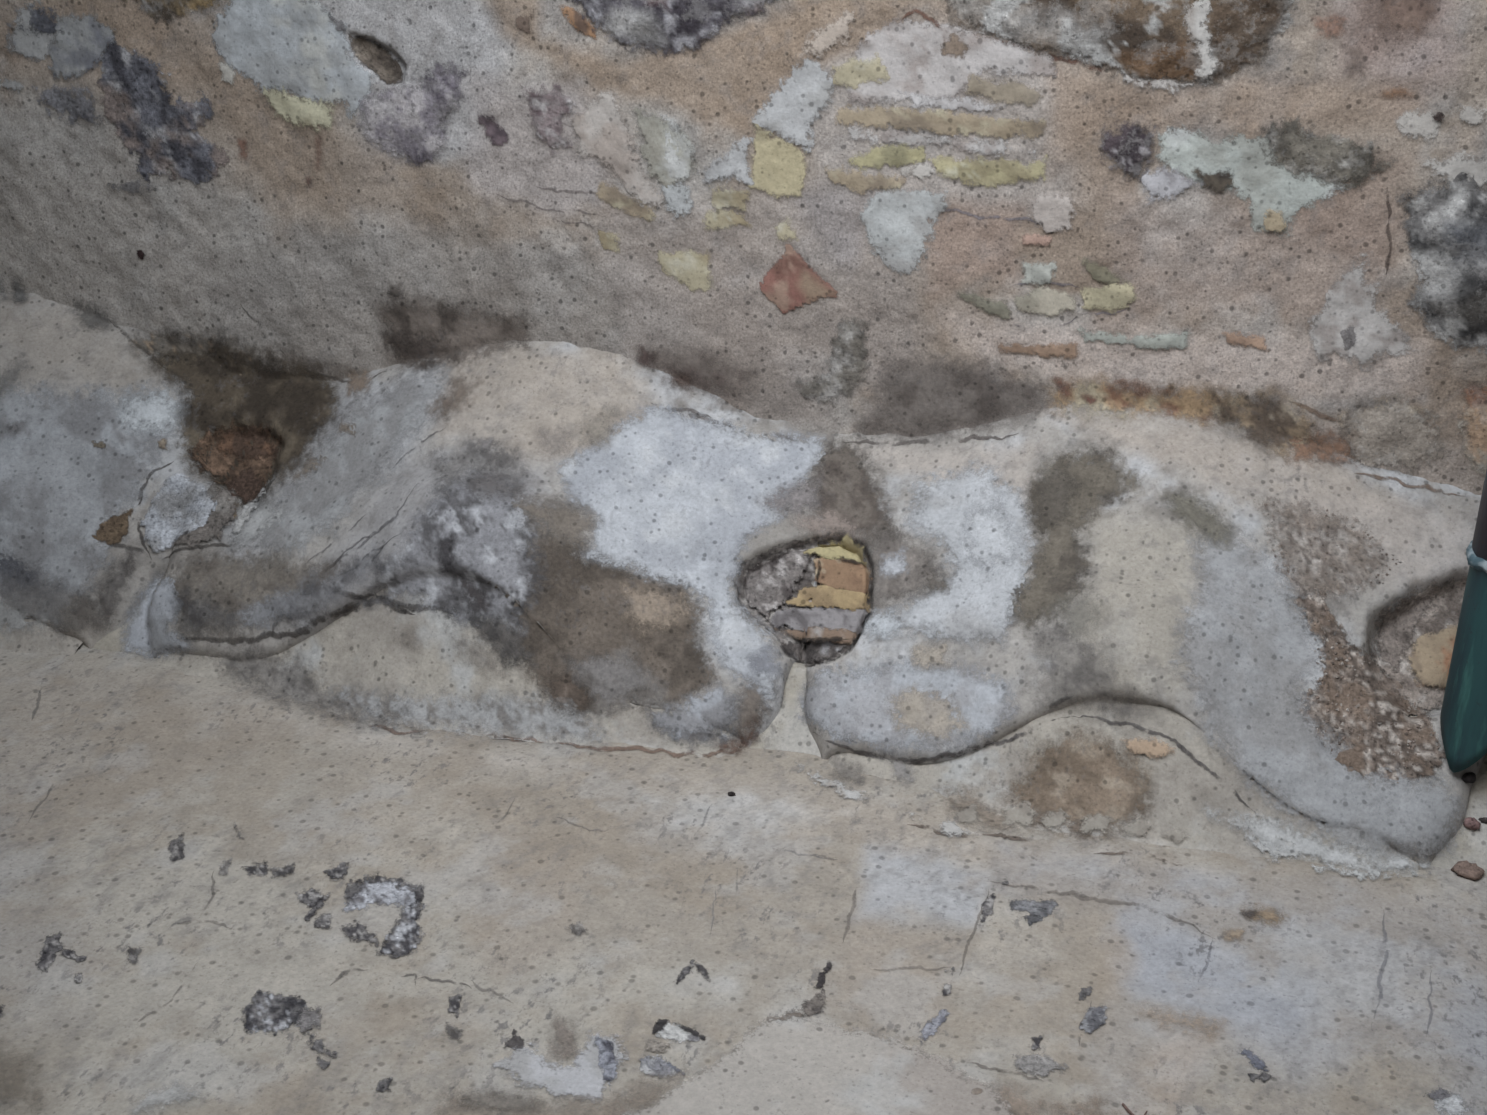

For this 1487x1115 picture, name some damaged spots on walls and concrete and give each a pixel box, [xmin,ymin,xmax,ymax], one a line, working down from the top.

leakage [130,330,371,505]
leakage [638,347,751,398]
leakage [860,362,1044,439]
crack [111,461,236,558]
crack [178,430,481,645]
leakage [170,438,779,755]
peeling [558,406,826,738]
peeling [1170,497,1487,880]
crack [814,696,1256,814]
flaking render [939,821,976,837]
spalling [219,859,425,958]
spalling [242,990,338,1069]